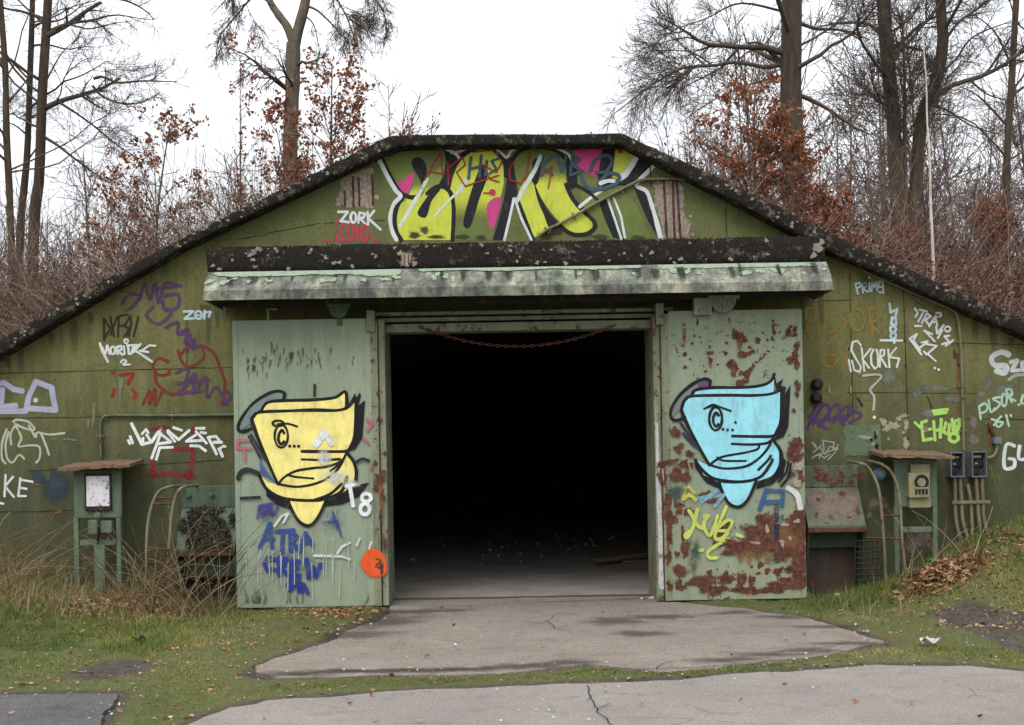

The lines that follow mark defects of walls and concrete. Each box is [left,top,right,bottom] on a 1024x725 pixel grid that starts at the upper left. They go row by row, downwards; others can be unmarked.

spalling [335,167,380,209]
spalling [650,166,695,239]
peeling [204,250,643,285]
corrosion [681,319,801,413]
corrosion [786,437,868,488]
corrosion [370,460,387,576]
corrosion [656,426,806,597]
crack [568,661,763,725]